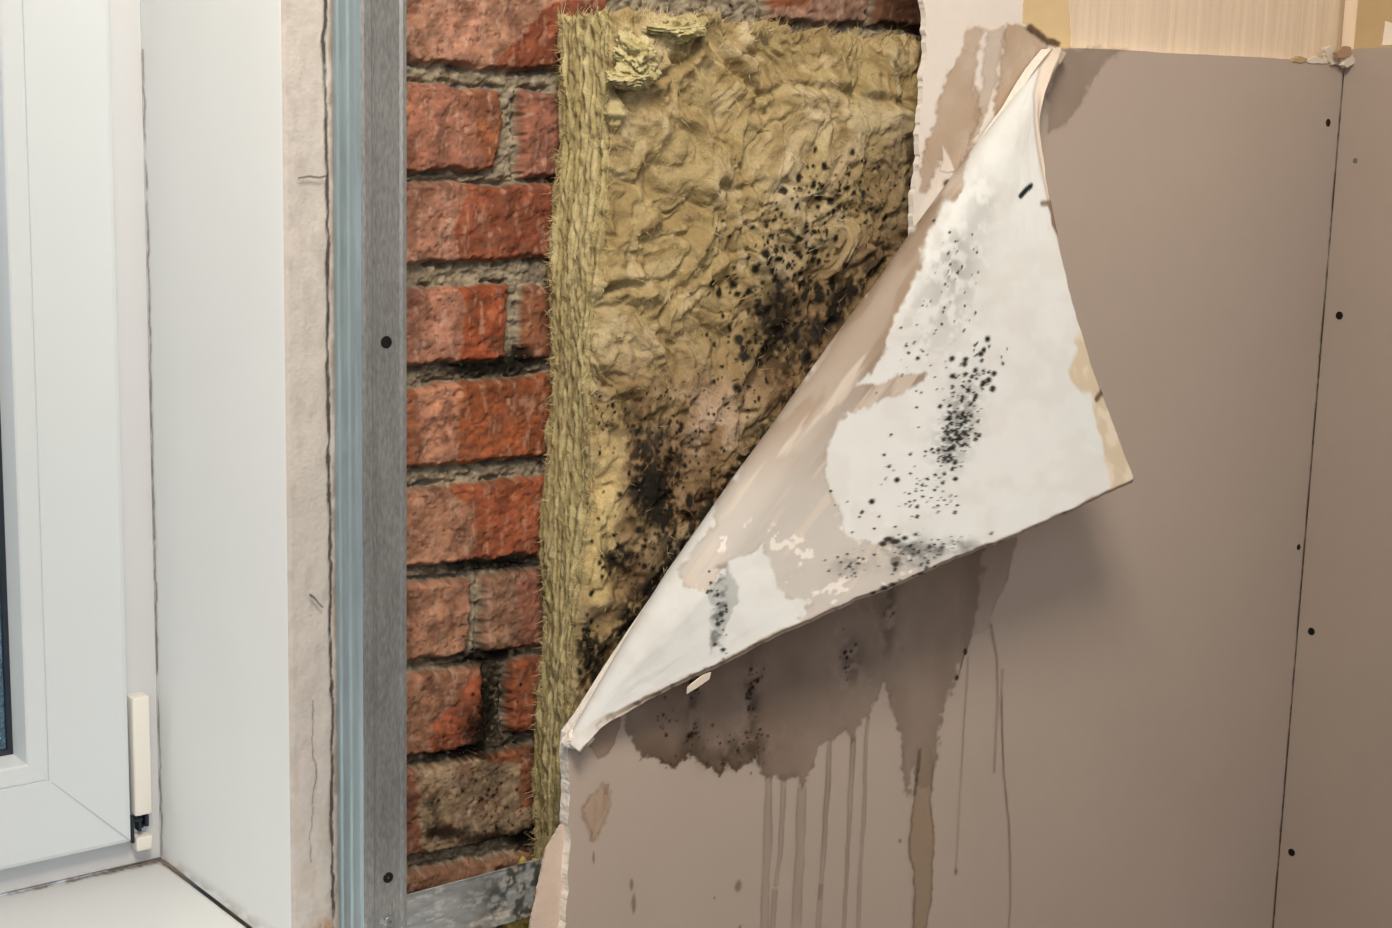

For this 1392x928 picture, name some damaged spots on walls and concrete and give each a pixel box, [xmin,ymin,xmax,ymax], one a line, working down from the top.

peeling [1292,0,1392,68]
damp [576,24,1060,694]
spalling [561,729,595,749]
peeling [687,672,711,694]
damp [633,668,769,777]
damp [909,779,934,928]